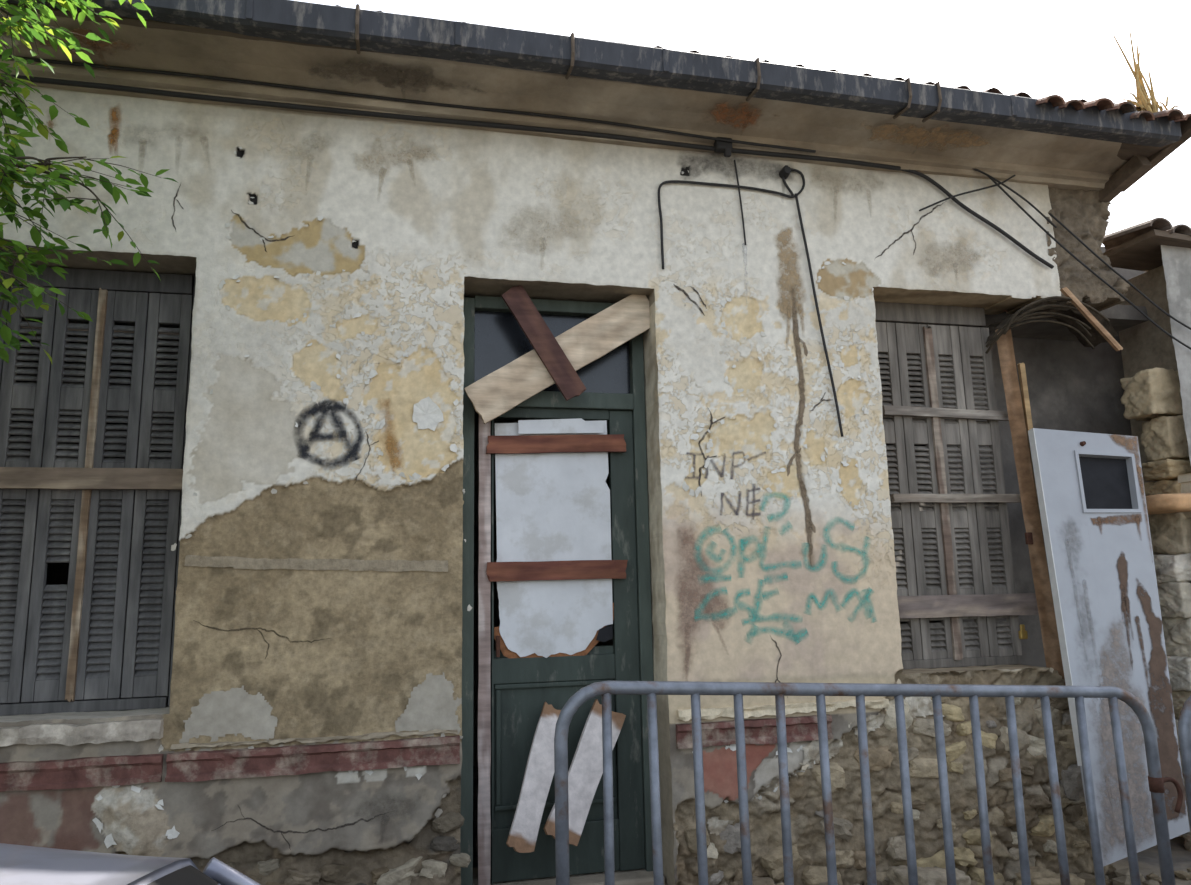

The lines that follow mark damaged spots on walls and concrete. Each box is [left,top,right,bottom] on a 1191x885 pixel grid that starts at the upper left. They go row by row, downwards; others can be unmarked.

spalling [219,215,364,325]
leakage [777,229,804,332]
spalling [817,259,881,301]
peeling [293,312,378,405]
peeling [837,346,870,419]
peeling [682,408,778,497]
peeling [762,466,800,500]
rust [1091,434,1150,539]
crack [193,620,330,659]
flaking render [158,346,491,885]
rust [1117,553,1186,821]
crack [212,804,393,850]